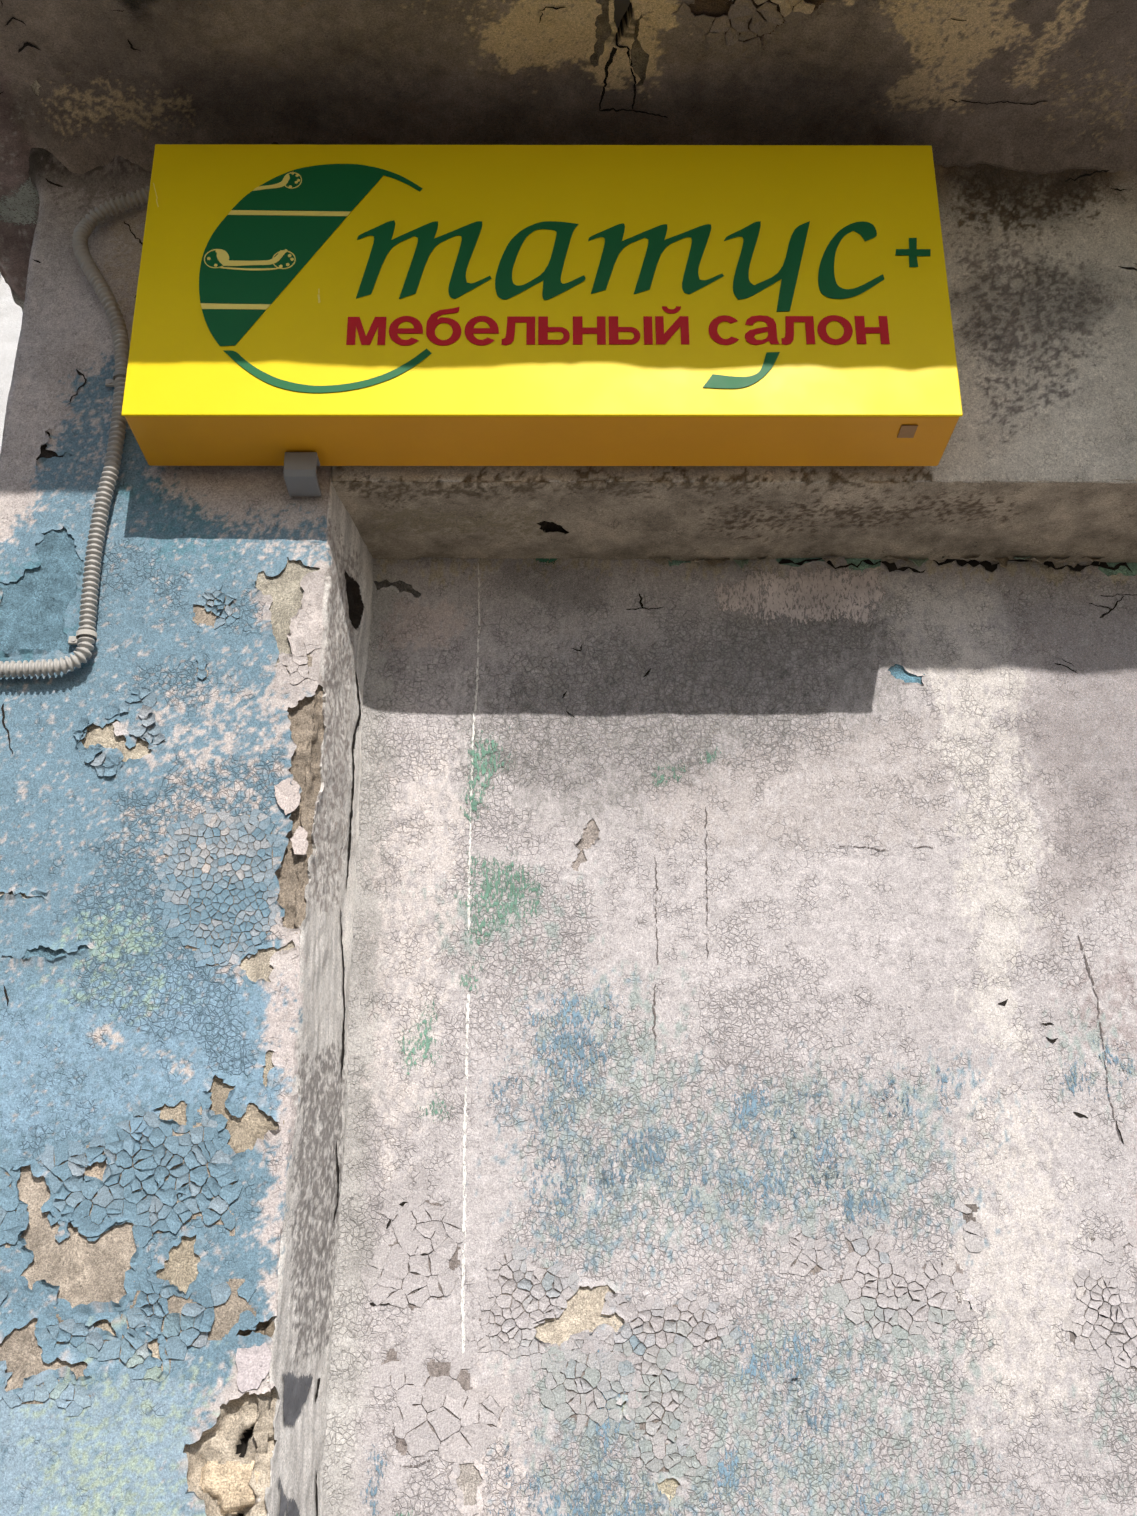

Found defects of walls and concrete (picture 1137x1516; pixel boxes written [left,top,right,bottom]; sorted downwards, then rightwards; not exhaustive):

peeling [0,523,86,661]
peeling [344,570,425,629]
peeling [72,687,166,777]
peeling [157,553,327,990]
crack [340,674,361,1078]
crack [332,1142,340,1220]
peeling [0,1045,286,1516]
crack [361,1169,742,1477]
peeling [526,1278,631,1353]
crack [779,1199,984,1349]
crack [1061,1233,1137,1381]
crack [313,1472,321,1516]